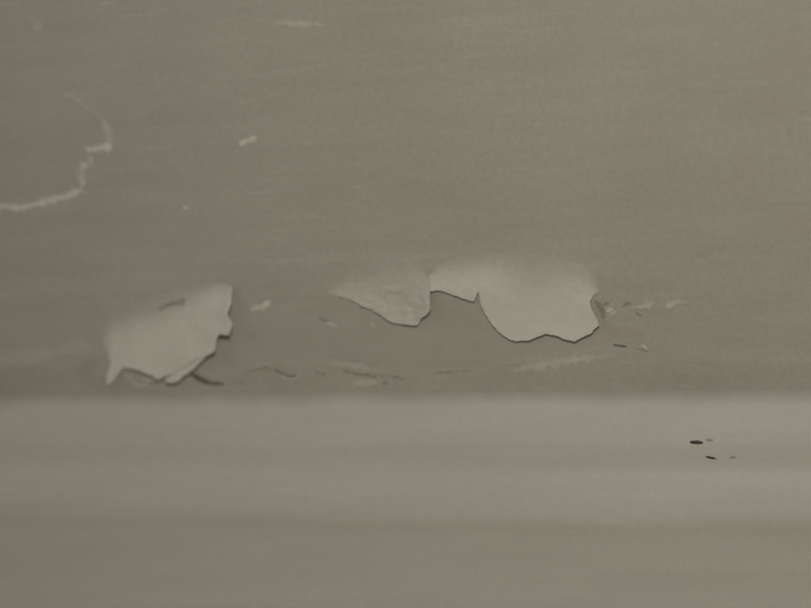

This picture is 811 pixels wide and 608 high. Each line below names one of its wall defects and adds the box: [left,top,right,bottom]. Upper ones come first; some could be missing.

crack [0,86,124,213]
spalling [101,253,650,390]